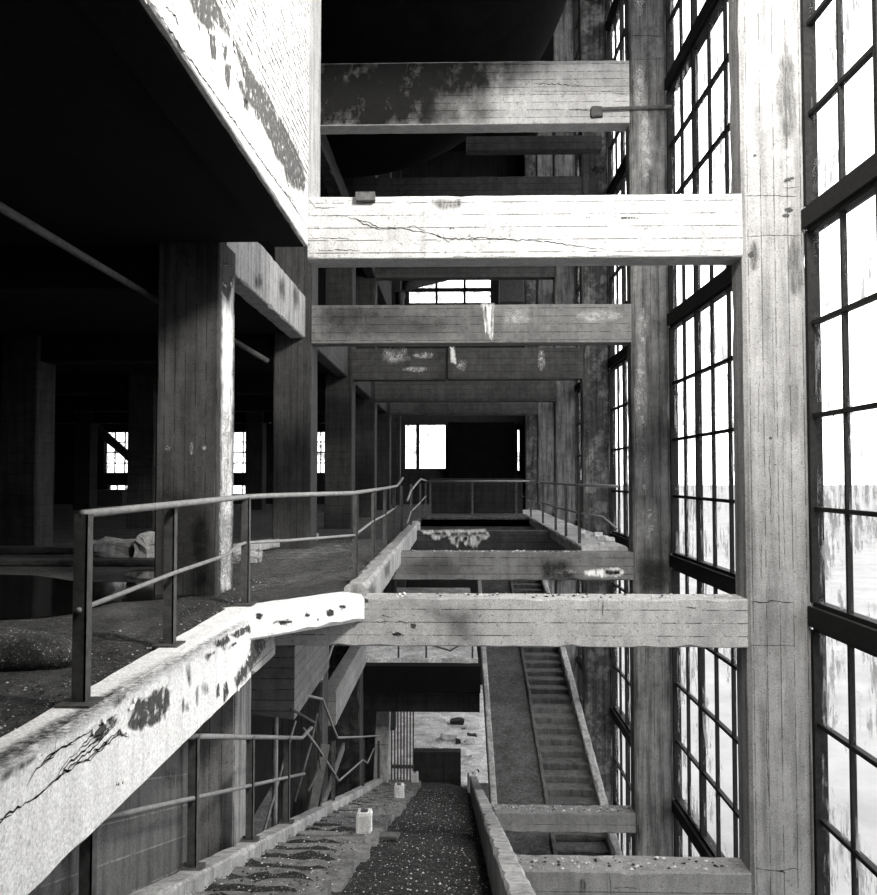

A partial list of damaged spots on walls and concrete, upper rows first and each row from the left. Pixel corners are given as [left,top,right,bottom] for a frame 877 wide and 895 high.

peeling [189,0,305,197]
crack [150,1,605,251]
crack [0,714,128,823]
peeling [92,680,173,741]